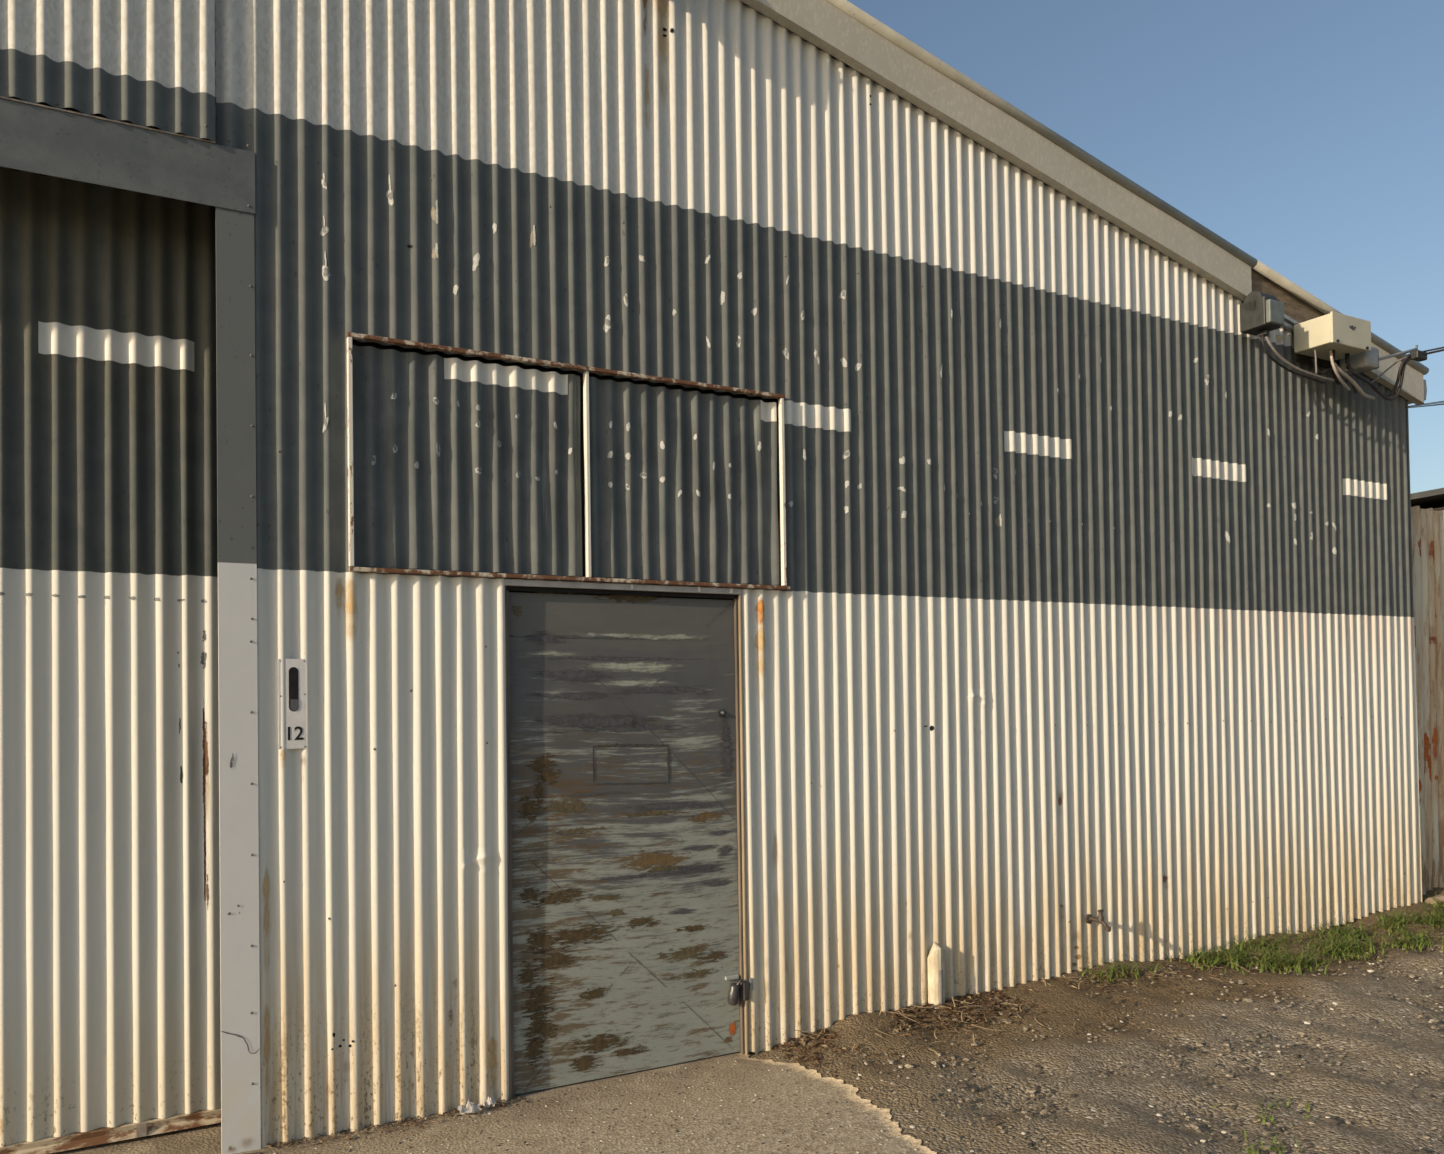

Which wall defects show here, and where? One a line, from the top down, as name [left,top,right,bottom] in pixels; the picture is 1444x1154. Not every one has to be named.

corrosion [643,0,666,55]
peeling [386,174,394,205]
peeling [320,216,330,281]
peeling [603,315,612,333]
corrosion [336,582,355,614]
corrosion [756,600,765,672]
corrosion [518,752,605,835]
corrosion [628,810,724,824]
corrosion [1419,726,1438,805]
corrosion [614,850,691,872]
corrosion [516,886,660,1072]
corrosion [657,924,732,981]